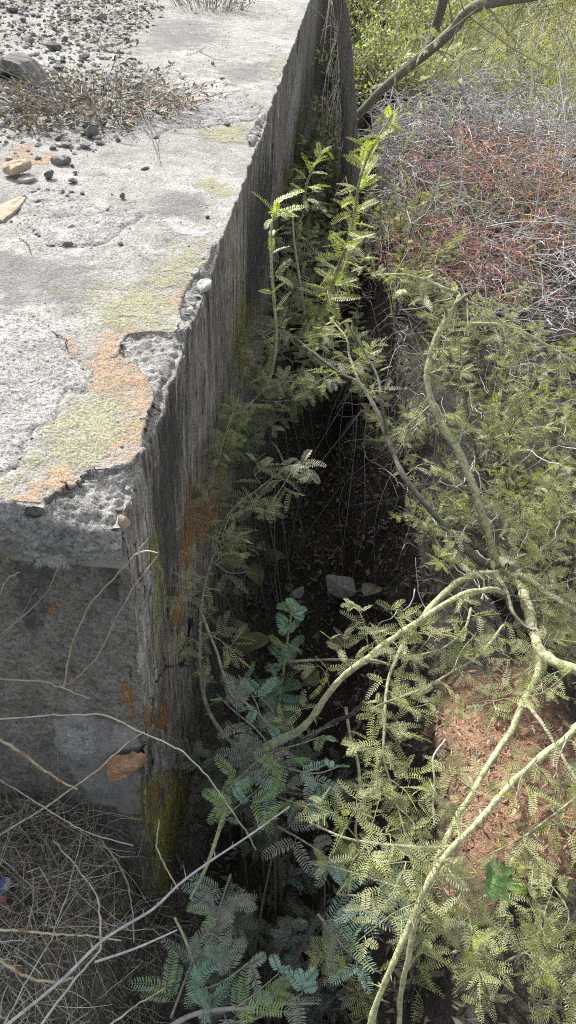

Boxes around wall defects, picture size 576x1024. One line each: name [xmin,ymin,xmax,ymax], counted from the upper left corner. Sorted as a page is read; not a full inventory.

spalling [120,252,215,460]
spalling [0,469,140,562]